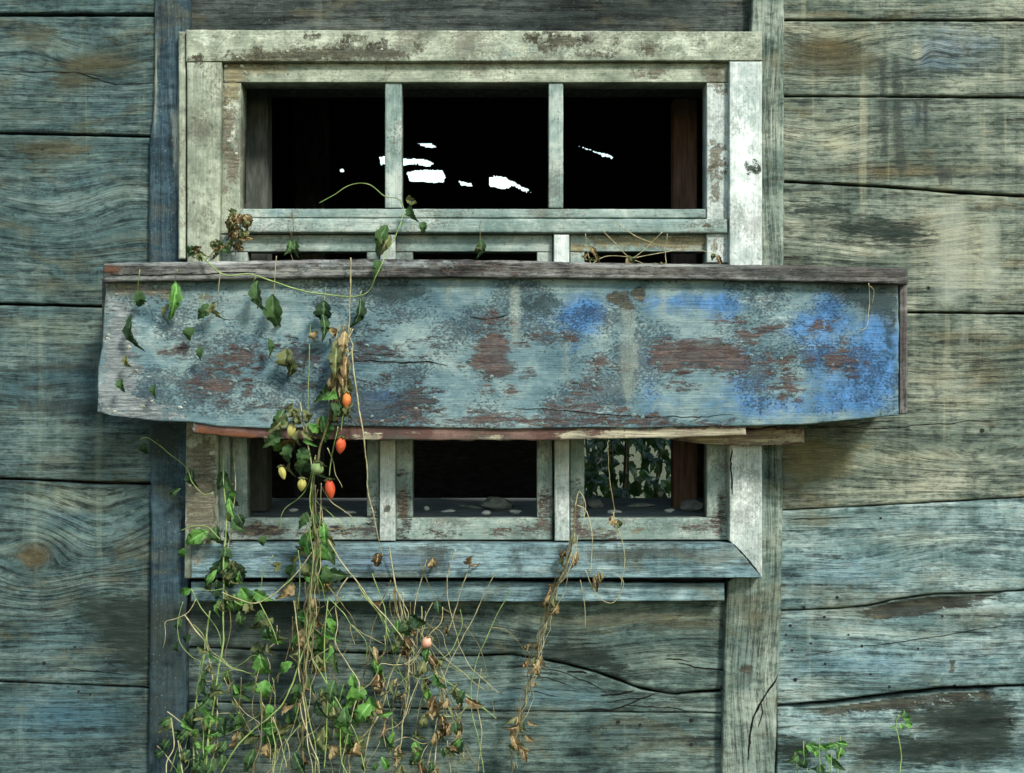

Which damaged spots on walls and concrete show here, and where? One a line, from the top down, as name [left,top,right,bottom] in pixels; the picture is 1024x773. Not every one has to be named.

peeling [522,31,624,60]
peeling [630,40,668,81]
peeling [697,63,728,98]
peeling [707,138,728,202]
peeling [340,306,672,431]
peeling [645,314,871,404]
peeling [99,283,329,540]
crack [509,666,685,711]
crack [666,658,725,690]
crack [748,676,778,760]